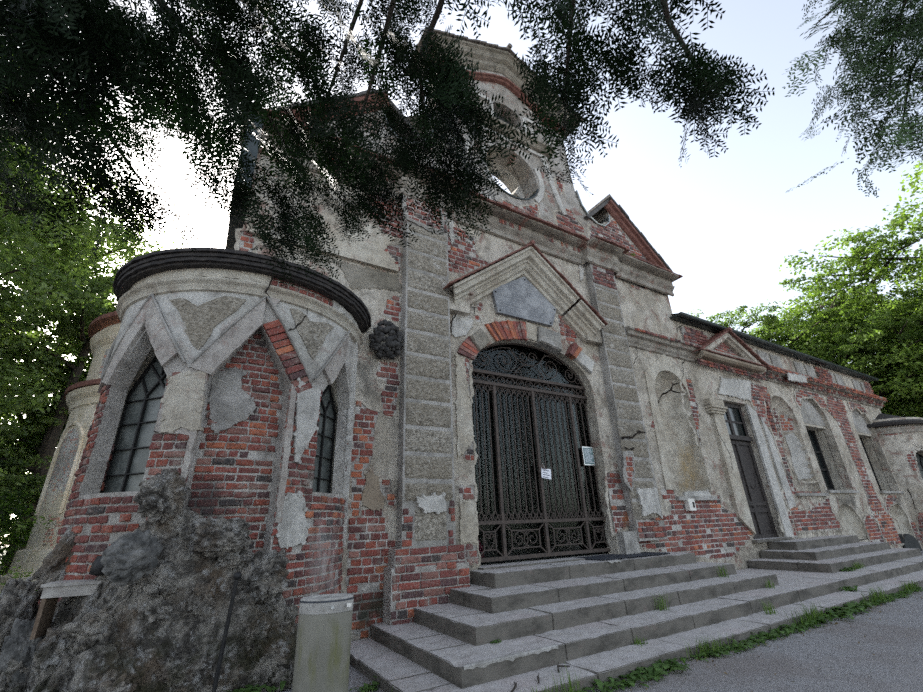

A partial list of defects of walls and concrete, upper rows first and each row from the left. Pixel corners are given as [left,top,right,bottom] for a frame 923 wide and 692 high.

spalling [234,228,259,253]
peeling [289,192,489,324]
peeling [160,367,256,434]
peeling [275,491,310,549]
spalling [345,358,400,638]
peeling [415,480,481,567]
crack [621,430,646,450]
crack [658,360,685,403]
spalling [605,451,755,563]
spalling [718,372,923,546]